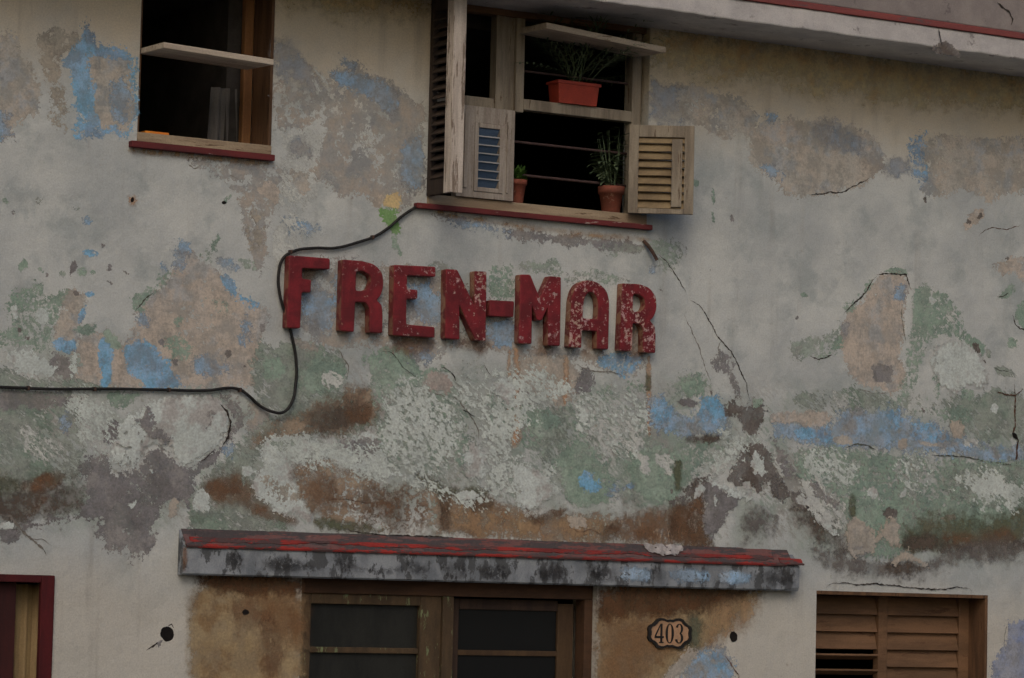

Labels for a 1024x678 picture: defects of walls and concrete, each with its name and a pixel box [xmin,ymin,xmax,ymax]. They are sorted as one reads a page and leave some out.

peeling [61,19,140,143]
peeling [747,113,886,200]
peeling [0,157,1024,585]
crack [659,255,749,396]
crack [998,385,1023,464]
crack [828,582,971,591]